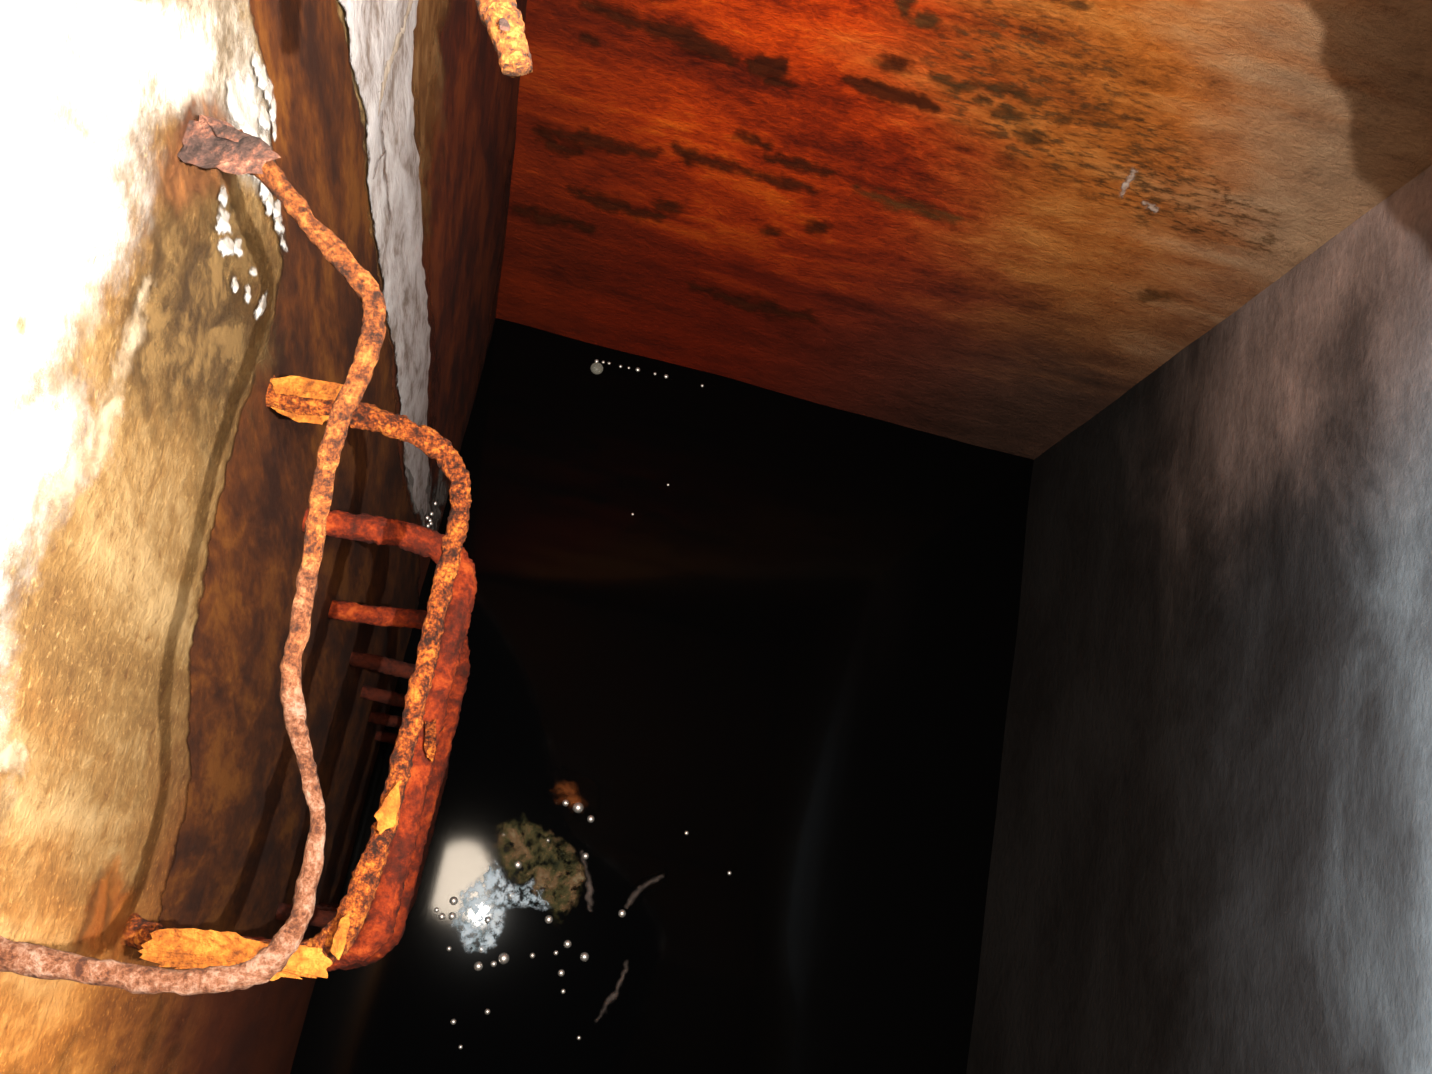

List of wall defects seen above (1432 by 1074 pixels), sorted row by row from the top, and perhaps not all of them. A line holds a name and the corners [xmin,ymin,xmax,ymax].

corrosion [499,18,510,31]
damp [581,0,737,66]
damp [879,54,909,72]
damp [897,0,938,29]
damp [534,128,834,194]
damp [569,189,681,222]
damp [806,221,830,233]
corrosion [131,95,269,450]
damp [0,0,595,597]
damp [158,201,420,940]
corrosion [84,874,131,952]